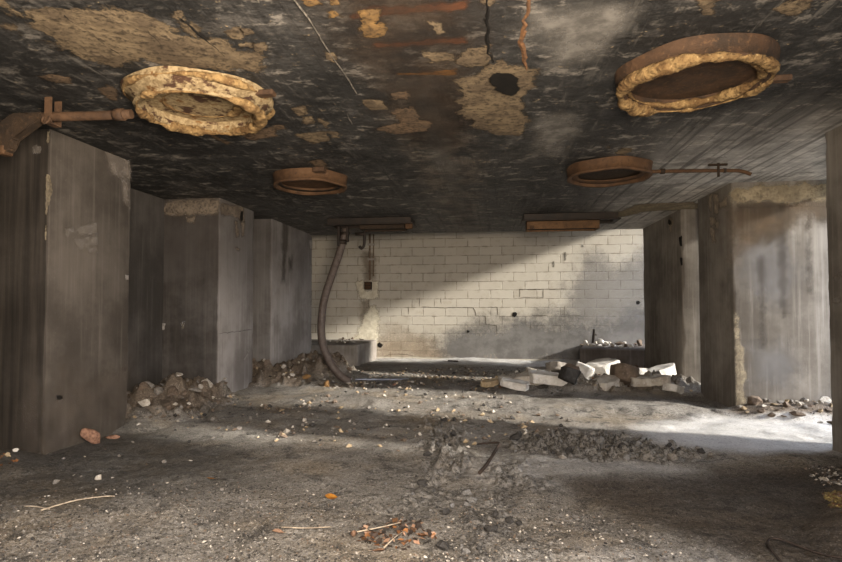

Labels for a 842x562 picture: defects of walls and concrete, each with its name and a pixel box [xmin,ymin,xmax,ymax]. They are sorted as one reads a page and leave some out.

peeling [0,0,270,73]
peeling [356,7,388,38]
rust [342,0,471,143]
peeling [422,44,541,137]
crack [483,0,494,63]
crack [518,0,531,71]
peeling [164,198,245,237]
peeling [729,181,826,205]